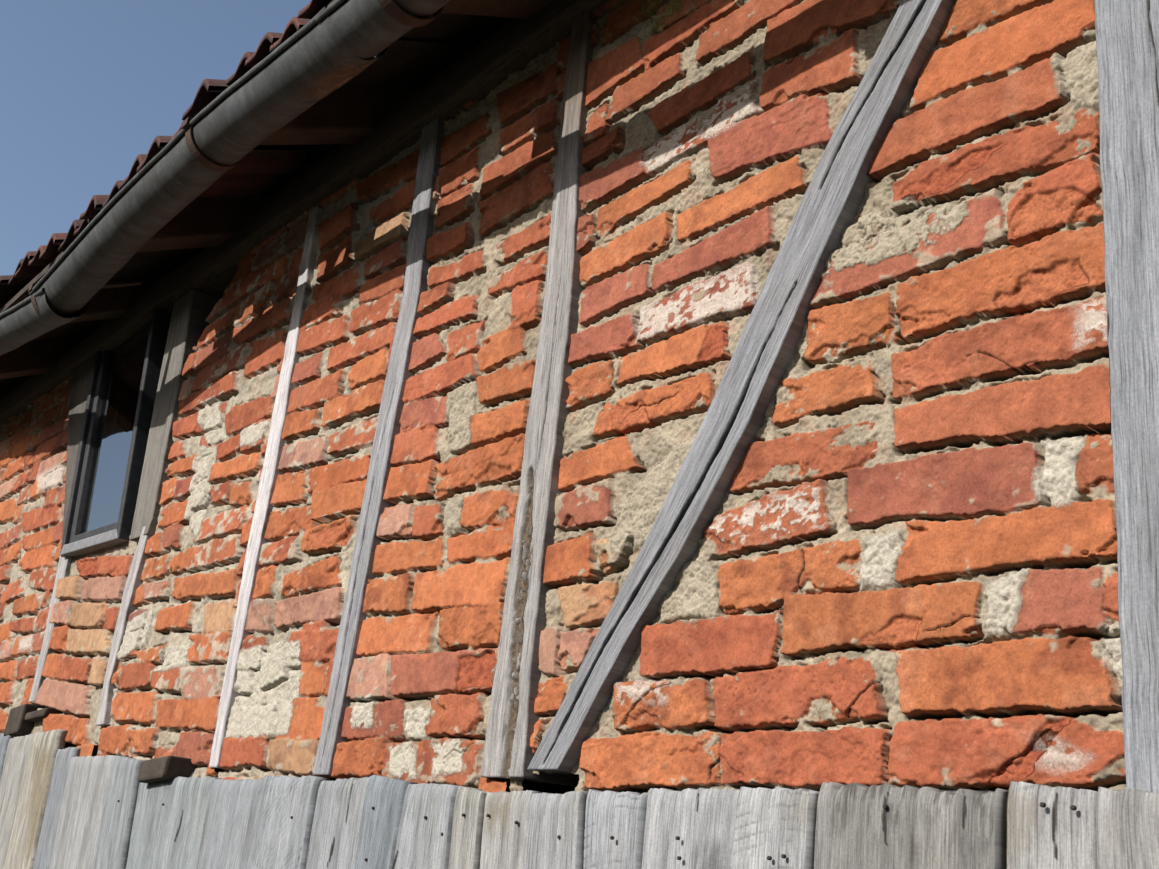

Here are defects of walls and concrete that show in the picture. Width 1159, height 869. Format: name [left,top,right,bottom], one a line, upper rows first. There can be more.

crack [968,353,1038,376]